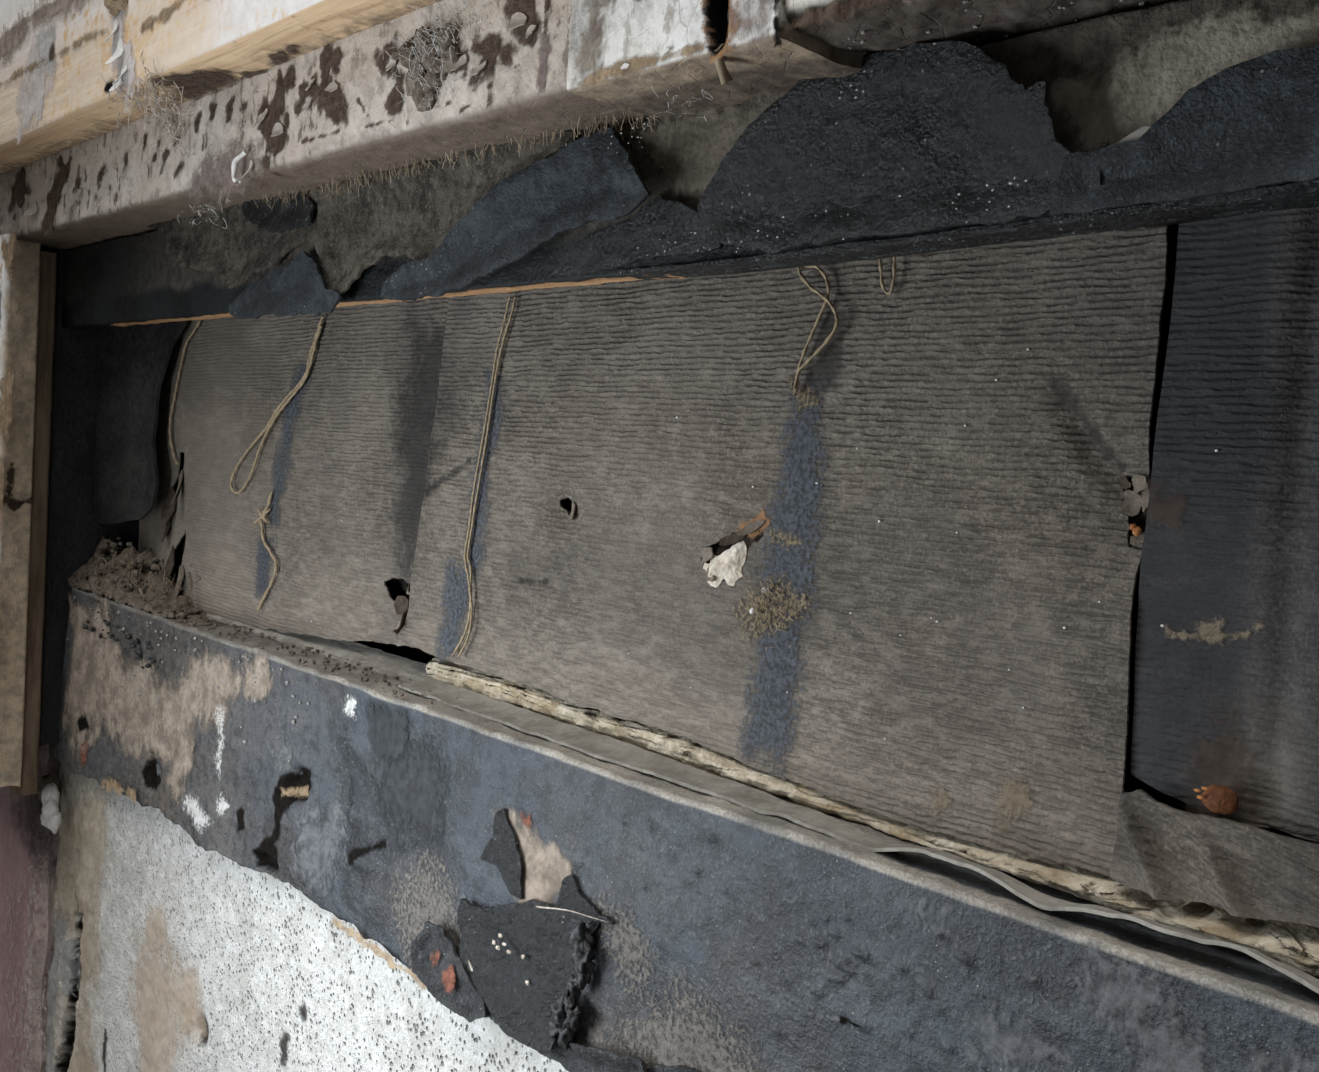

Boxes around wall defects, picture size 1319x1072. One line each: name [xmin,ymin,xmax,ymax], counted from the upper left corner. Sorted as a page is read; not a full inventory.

peeling [104,10,139,113]
peeling [235,44,348,197]
peeling [374,34,404,116]
peeling [447,0,540,92]
peeling [583,43,705,86]
peeling [1,149,82,281]
peeling [0,367,14,441]
water stain [398,335,443,569]
water stain [736,315,843,779]
peeling [344,696,357,717]
corrosion [430,950,455,992]